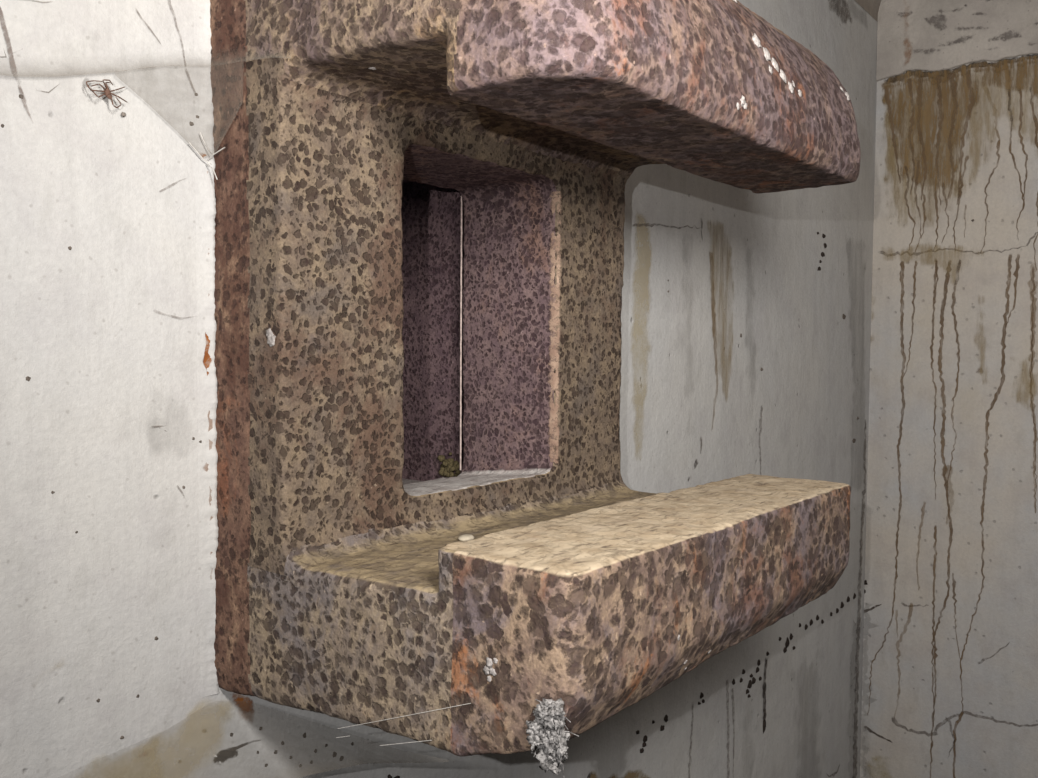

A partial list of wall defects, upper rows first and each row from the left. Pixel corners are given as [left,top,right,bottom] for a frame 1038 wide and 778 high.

leakage [882,63,1038,232]
crack [881,232,1038,257]
crack [852,423,1038,778]